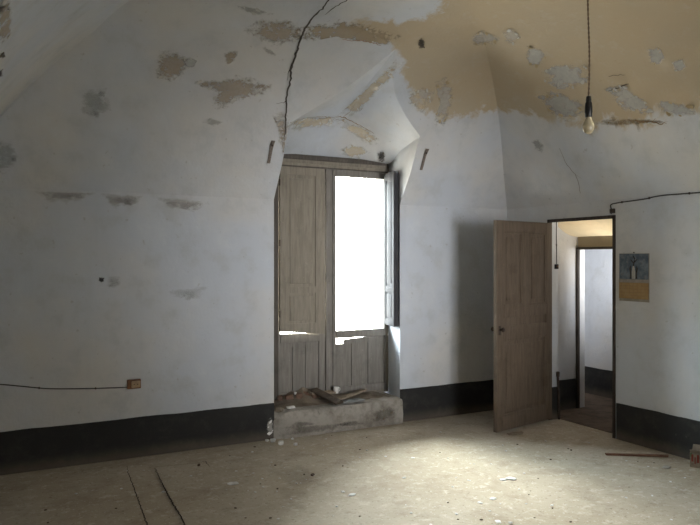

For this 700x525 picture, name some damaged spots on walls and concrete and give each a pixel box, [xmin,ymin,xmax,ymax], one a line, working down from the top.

crack [276,0,373,138]
peeling [289,22,389,44]